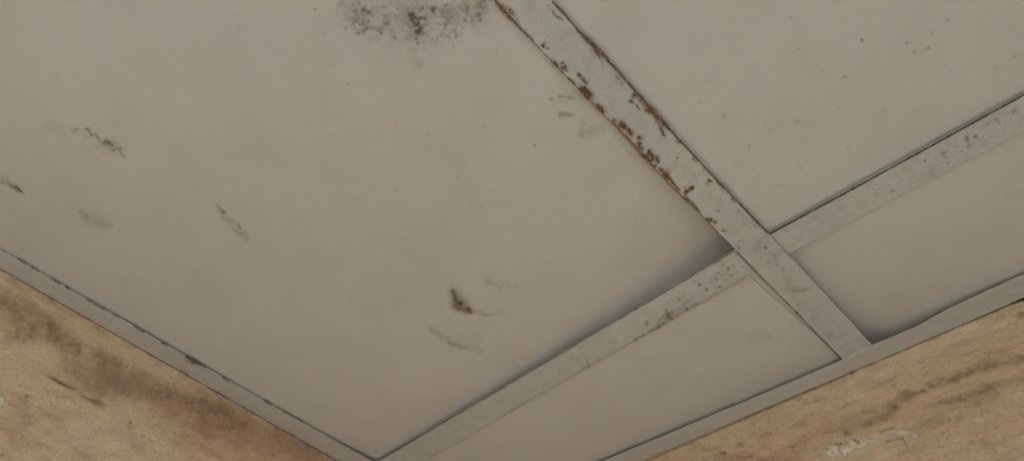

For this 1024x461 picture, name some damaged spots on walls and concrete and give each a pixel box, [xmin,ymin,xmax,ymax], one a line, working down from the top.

leakage [408,9,434,34]
corrosion [495,0,764,234]